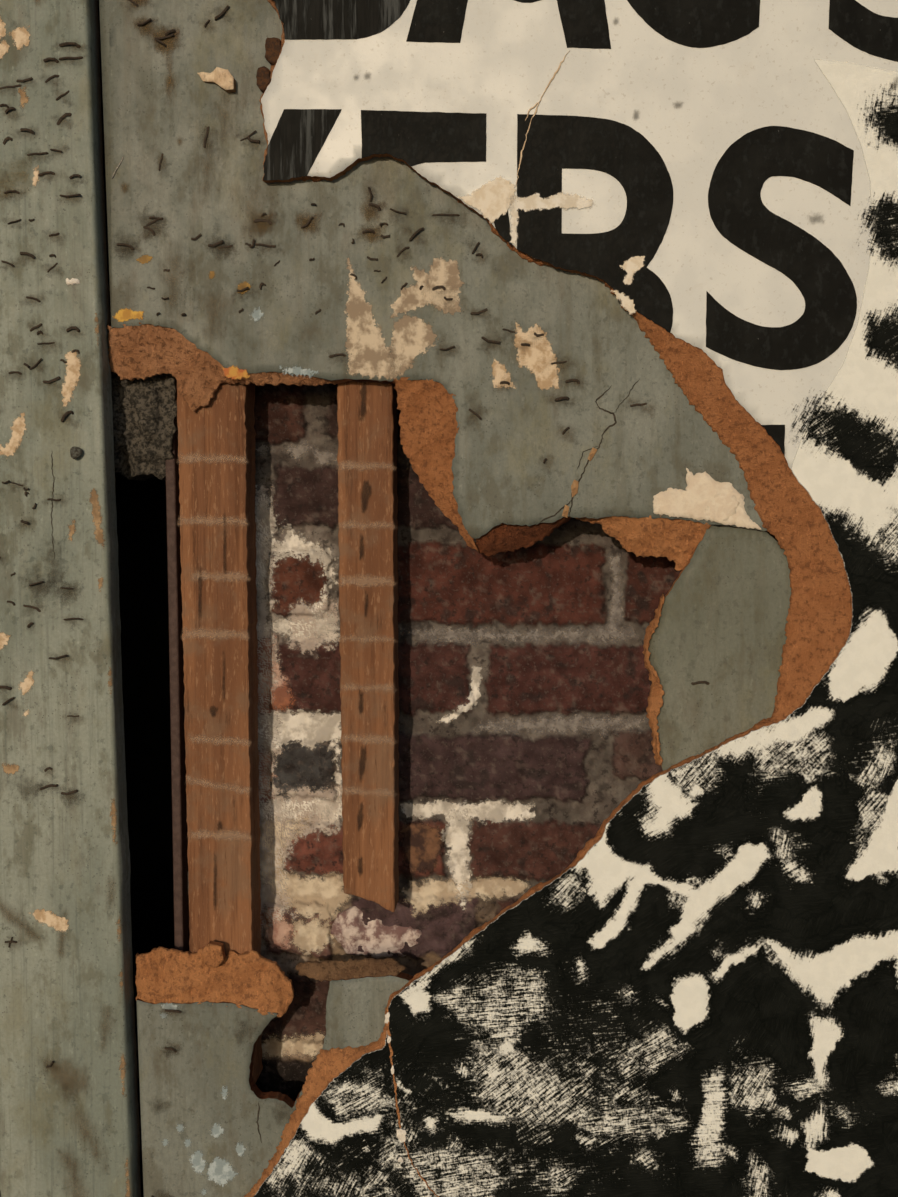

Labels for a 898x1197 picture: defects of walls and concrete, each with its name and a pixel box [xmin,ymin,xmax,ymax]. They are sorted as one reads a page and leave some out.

peeling [0,18,30,59]
peeling [197,67,236,93]
peeling [344,258,464,380]
peeling [61,351,81,407]
peeling [491,322,560,390]
peeling [0,413,26,456]
crack [541,380,639,522]
peeling [653,468,762,530]
damp [374,556,637,646]
damp [183,485,391,956]
damp [475,710,647,735]
damp [400,798,536,917]